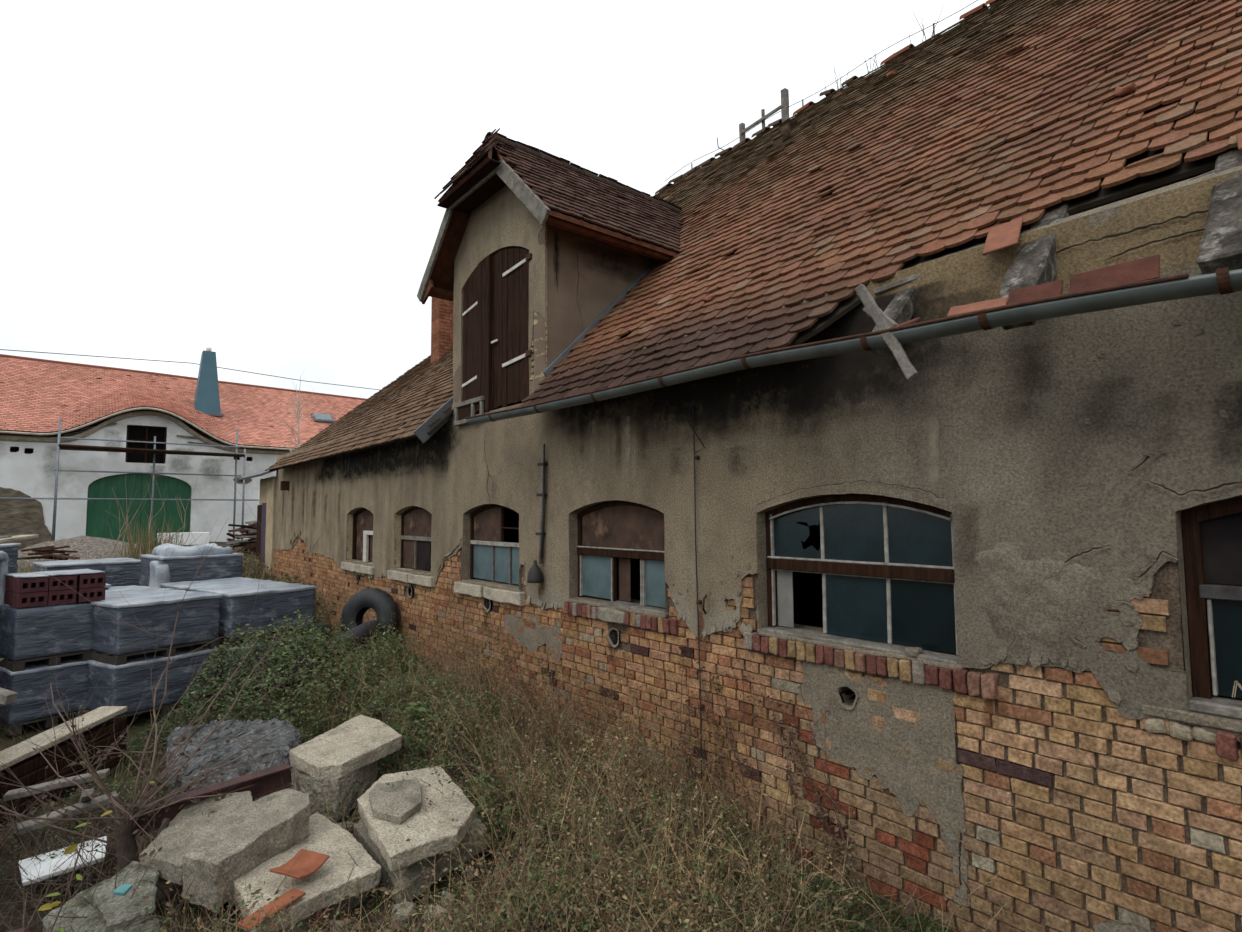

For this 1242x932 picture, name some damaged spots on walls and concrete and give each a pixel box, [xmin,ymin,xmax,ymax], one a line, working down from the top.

crack [1056,210,1208,265]
leakage [801,293,897,344]
leakage [564,340,941,480]
flaking render [702,564,757,639]
flaking render [1094,554,1170,672]
flaking render [981,648,1091,671]